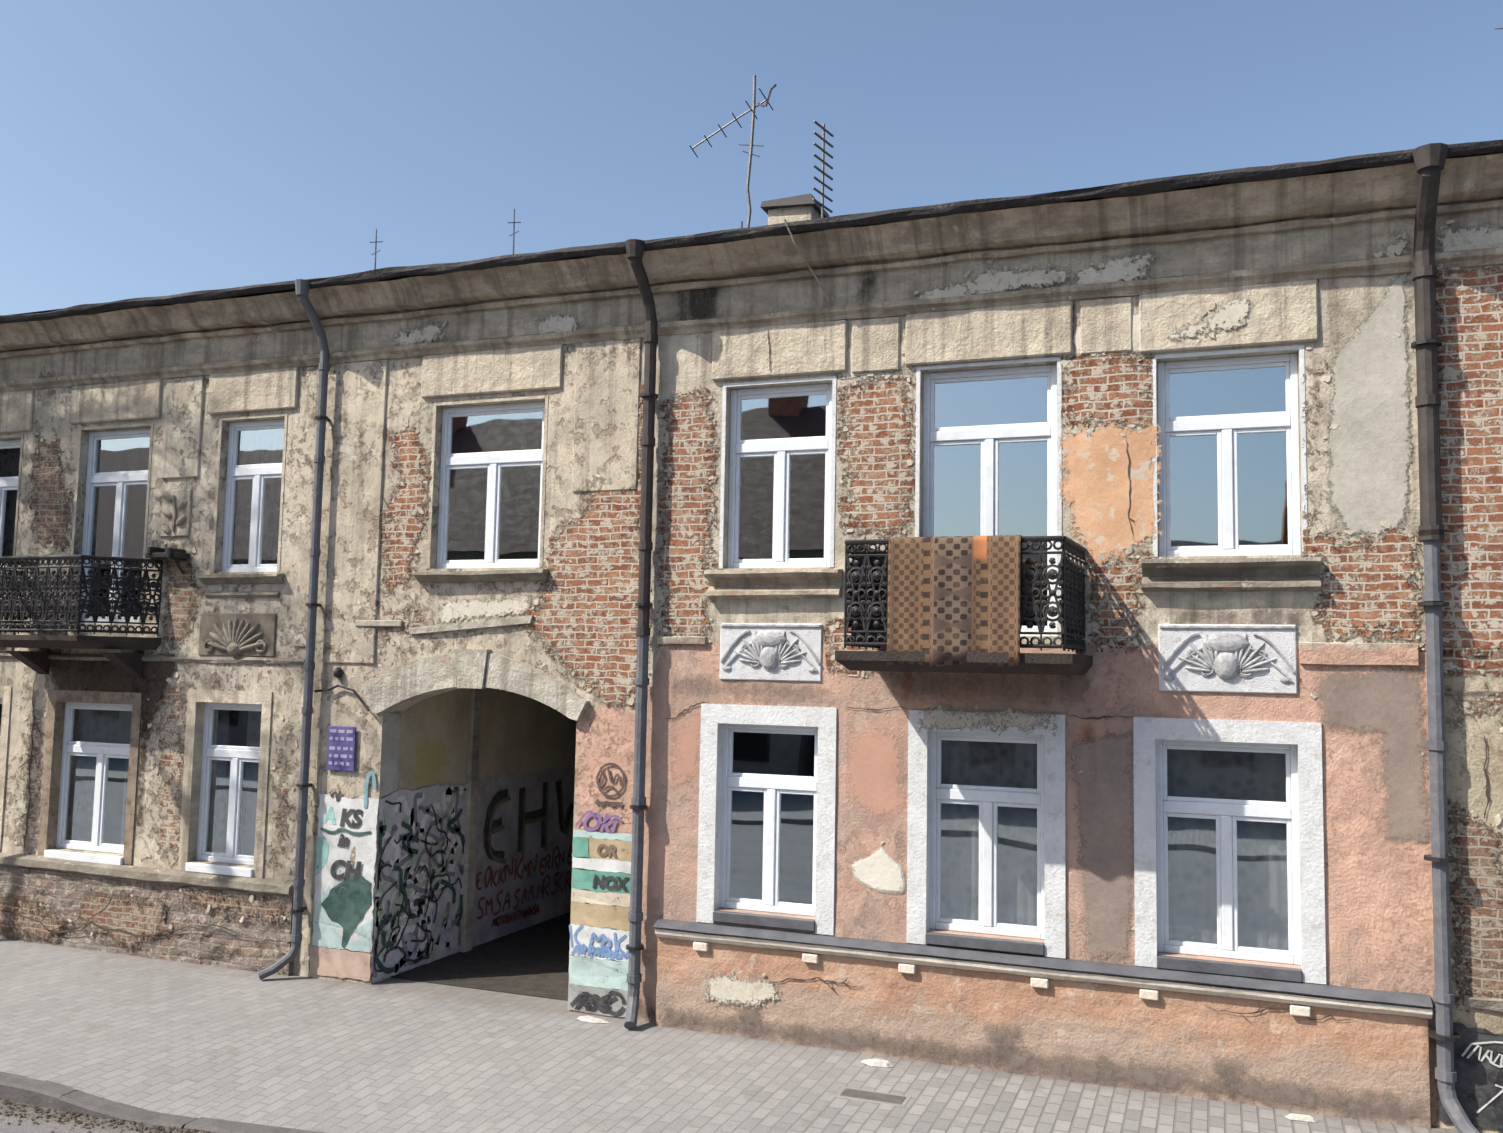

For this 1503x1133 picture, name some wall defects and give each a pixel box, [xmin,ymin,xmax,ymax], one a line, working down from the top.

peeling [913,251,1157,313]
peeling [1167,295,1253,341]
spalling [377,383,721,709]
spalling [832,338,916,539]
peeling [1056,305,1163,654]
crack [1126,441,1135,540]
spalling [1301,265,1503,734]
flaking render [1310,665,1503,1014]
spalling [702,969,783,1009]
crack [1205,1001,1351,1024]